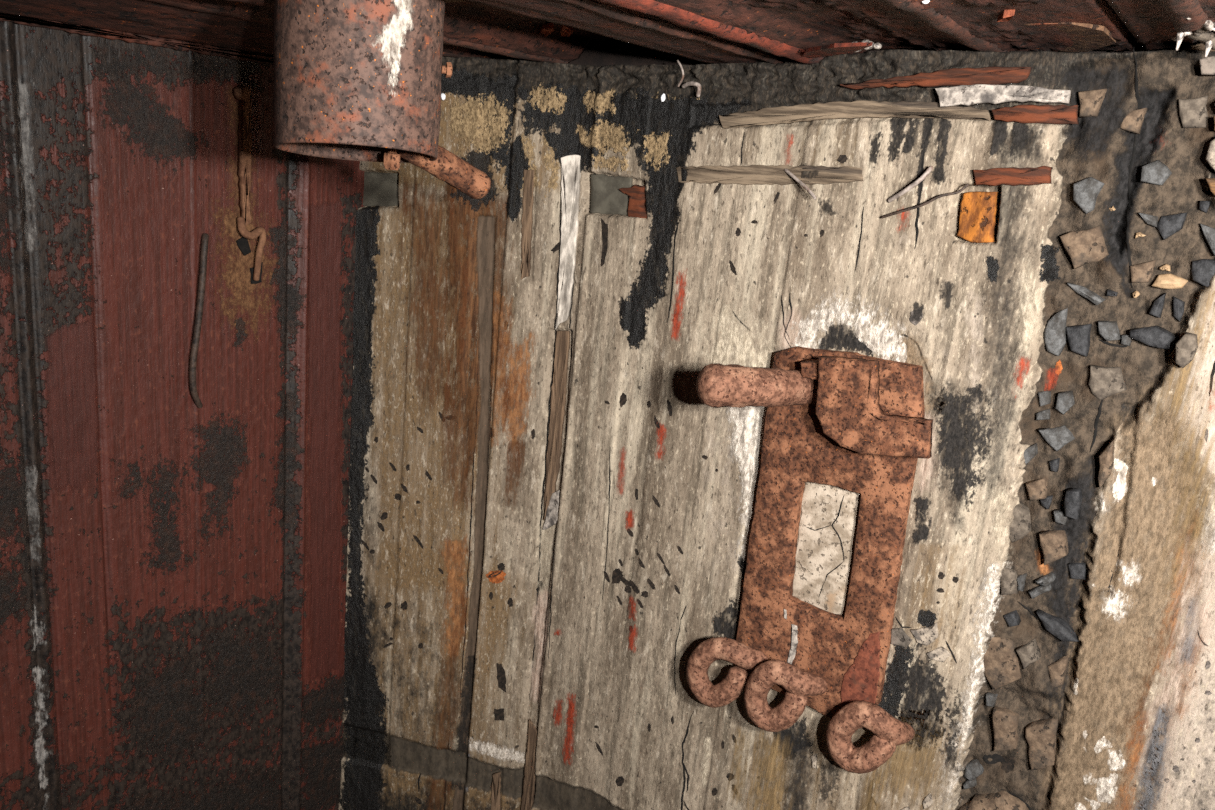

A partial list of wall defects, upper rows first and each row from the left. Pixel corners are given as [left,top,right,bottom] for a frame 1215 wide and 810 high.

water stain [18,83,33,188]
water stain [441,64,752,349]
water stain [929,185,1061,507]
spalling [955,48,1215,810]
water stain [31,606,46,650]
water stain [33,666,48,804]
water stain [733,717,839,810]
water stain [864,491,1010,810]